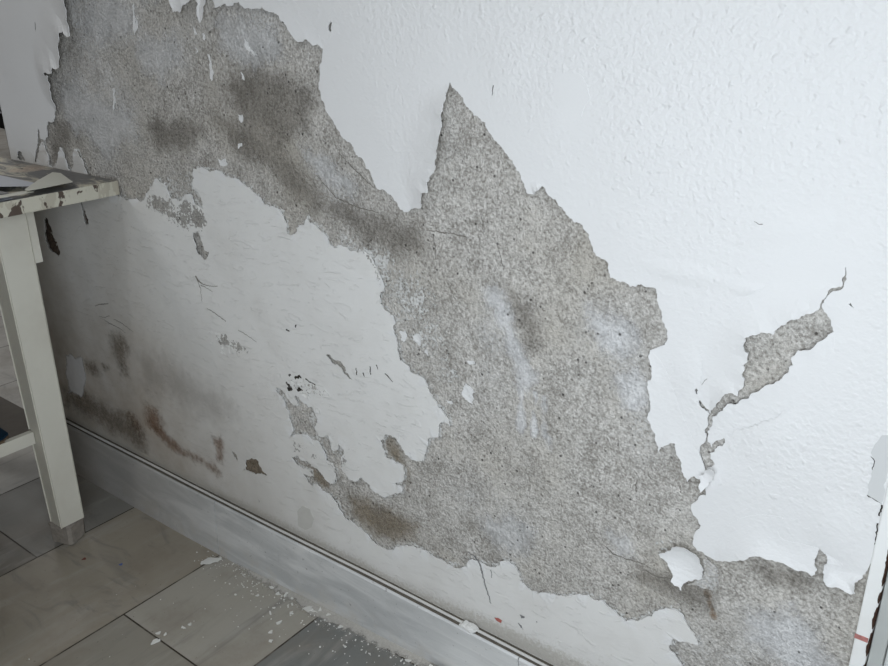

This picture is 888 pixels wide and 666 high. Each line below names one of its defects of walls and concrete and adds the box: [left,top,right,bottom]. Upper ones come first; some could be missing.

peeling [169,0,190,12]
peeling [213,0,323,49]
peeling [32,0,70,110]
damp [61,87,133,155]
peeling [398,82,450,209]
flaking render [46,218,60,256]
flaking render [147,195,207,231]
peeling [701,274,847,432]
peeling [647,351,714,482]
peeling [232,451,267,476]
peeling [659,546,703,590]
peeling [687,556,720,590]